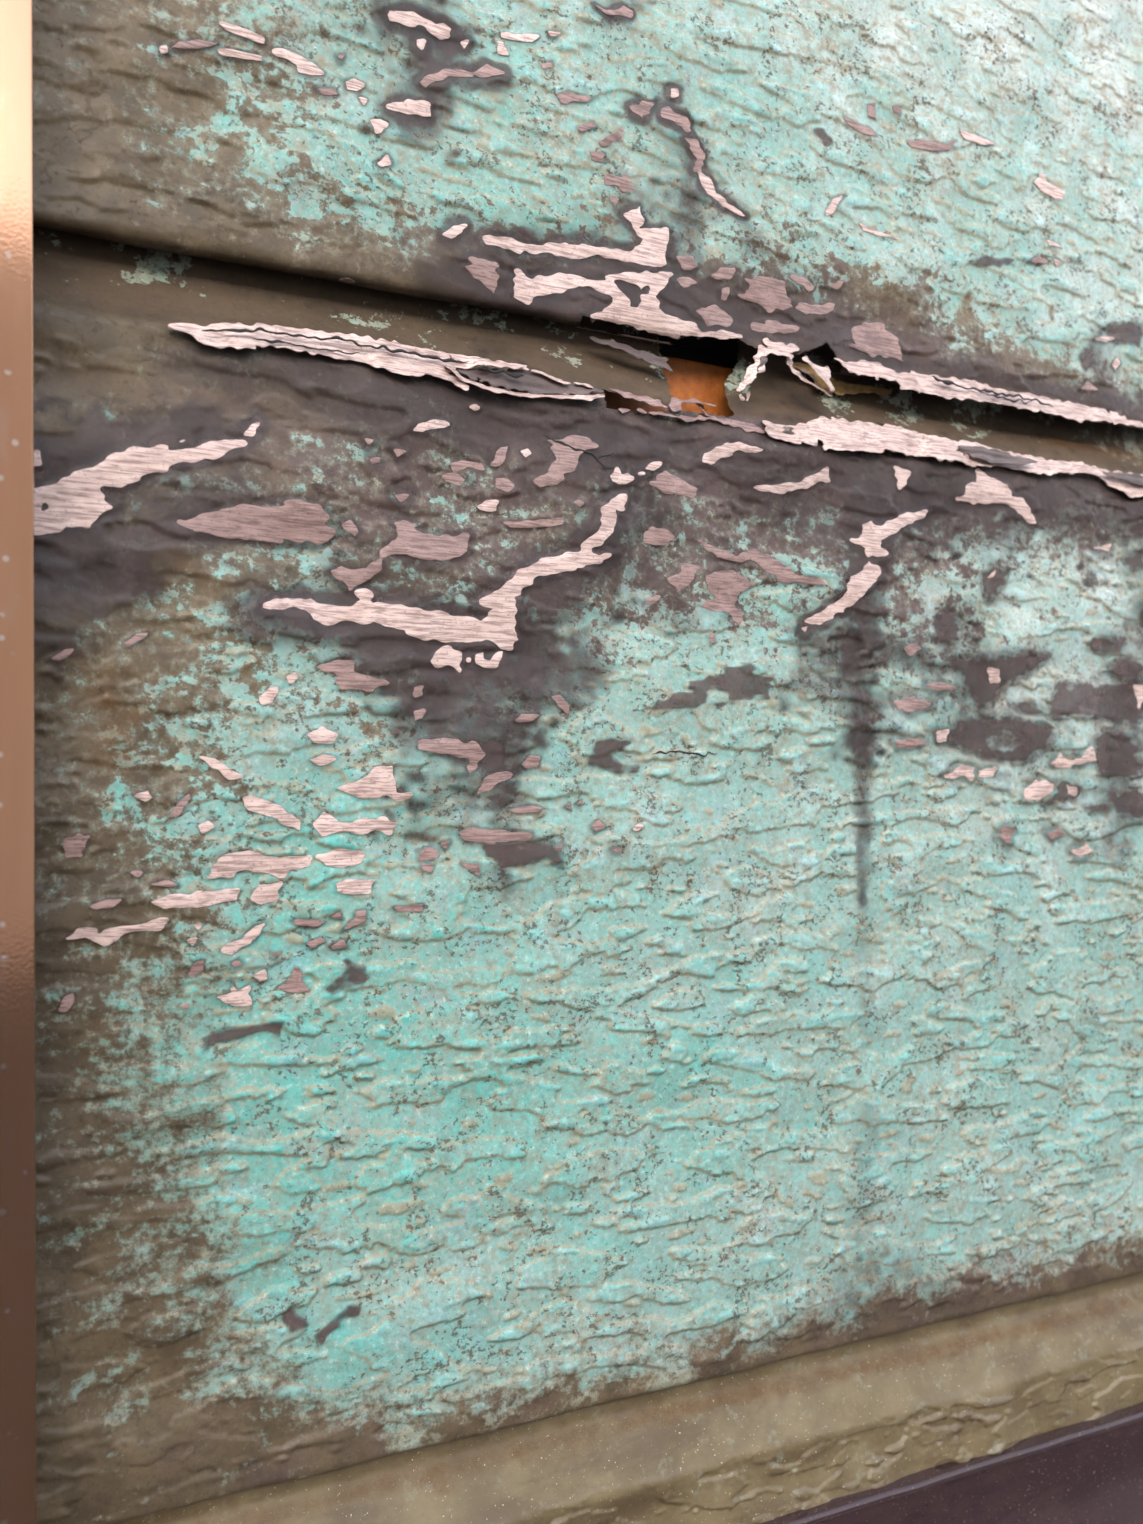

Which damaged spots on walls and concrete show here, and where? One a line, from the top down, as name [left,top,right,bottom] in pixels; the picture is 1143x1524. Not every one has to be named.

peeling [159,2,560,134]
peeling [437,82,1143,428]
leakage [34,404,227,488]
leakage [34,485,228,617]
peeling [34,411,269,536]
peeling [168,322,668,411]
leakage [233,488,663,807]
peeling [263,446,697,677]
leakage [184,344,1143,576]
leakage [810,583,935,904]
peeling [702,416,1143,524]
peeling [63,794,399,991]